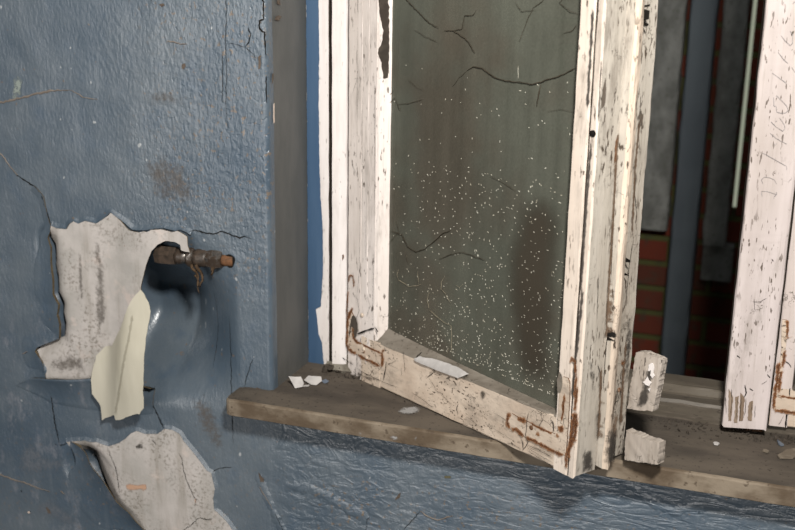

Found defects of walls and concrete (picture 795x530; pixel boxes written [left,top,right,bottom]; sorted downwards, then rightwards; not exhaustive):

crack [0,153,50,221]
crack [193,230,251,239]
peeling [16,186,193,420]
peeling [65,425,237,530]